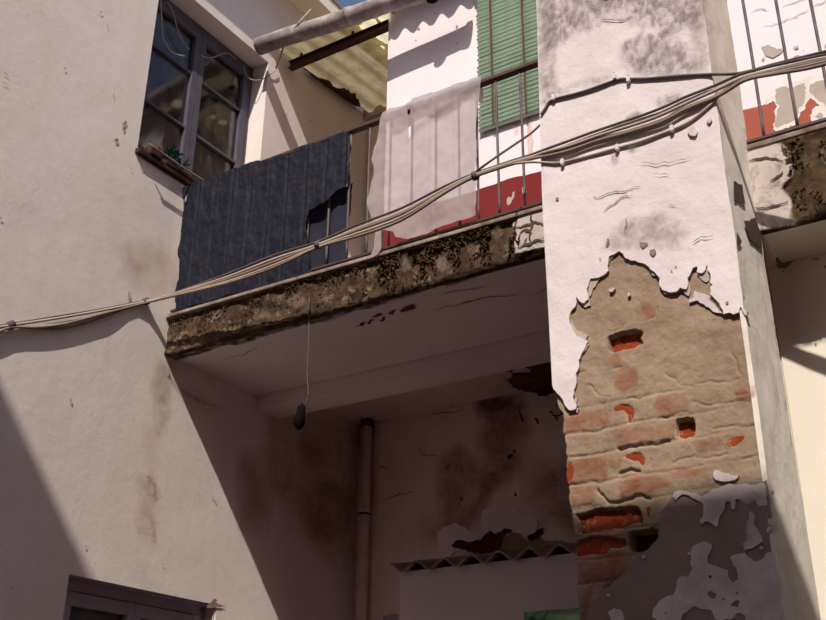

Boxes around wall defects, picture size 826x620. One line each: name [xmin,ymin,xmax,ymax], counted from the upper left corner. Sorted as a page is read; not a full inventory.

water stain [543,0,697,72]
peeling [761,45,783,67]
peeling [766,75,826,131]
spalling [734,181,745,204]
spalling [737,218,762,249]
water stain [170,250,545,360]
peeling [357,305,416,327]
crack [518,405,563,424]
spalling [451,252,783,620]